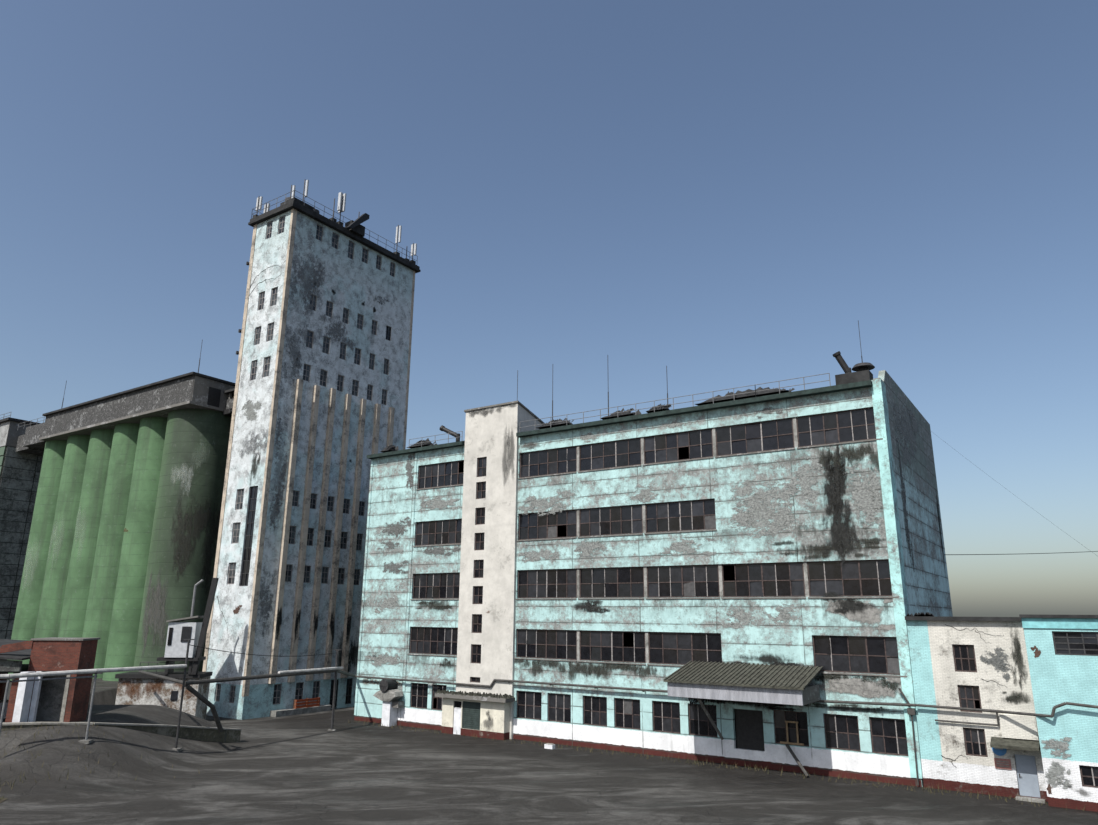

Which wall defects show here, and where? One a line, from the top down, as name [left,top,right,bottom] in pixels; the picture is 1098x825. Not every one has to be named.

peeling [242,400,261,421]
water stain [503,435,534,478]
peeling [729,457,823,538]
water stain [774,444,880,560]
water stain [171,496,221,595]
peeling [980,648,1010,682]
spalling [1041,737,1073,794]